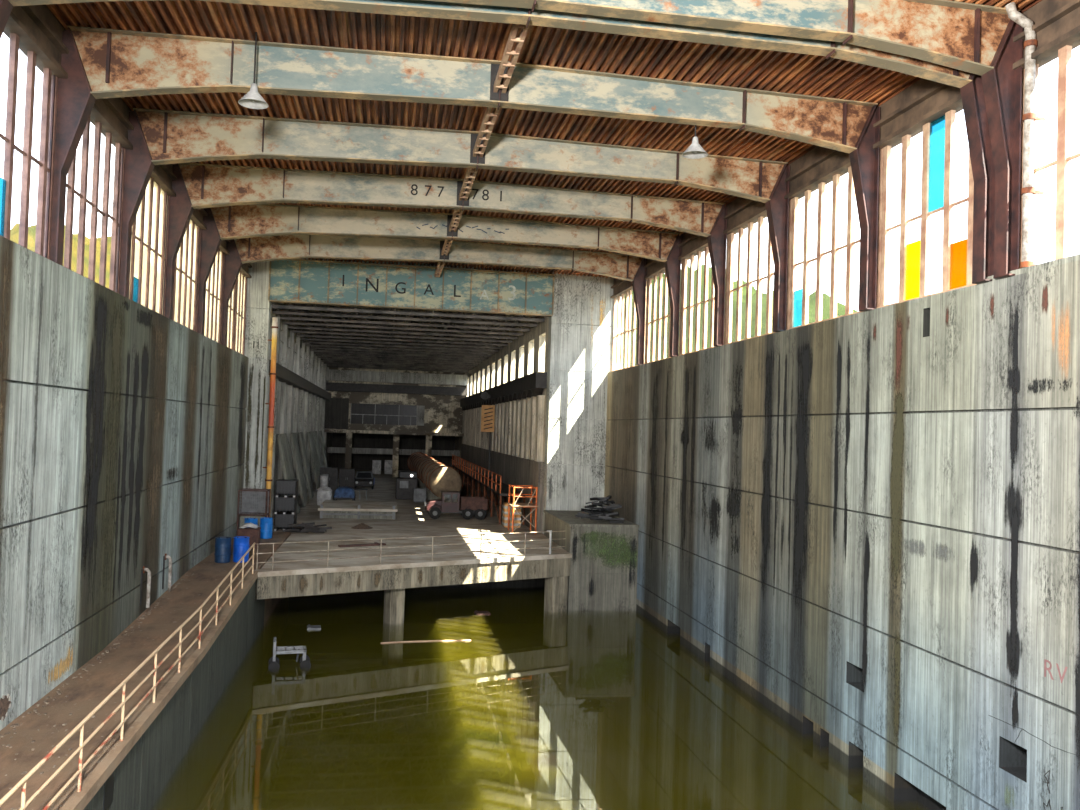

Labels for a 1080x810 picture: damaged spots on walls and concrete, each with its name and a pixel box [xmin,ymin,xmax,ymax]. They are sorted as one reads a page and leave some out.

damp [81,295,266,603]
damp [760,344,813,620]
damp [1005,308,1080,727]